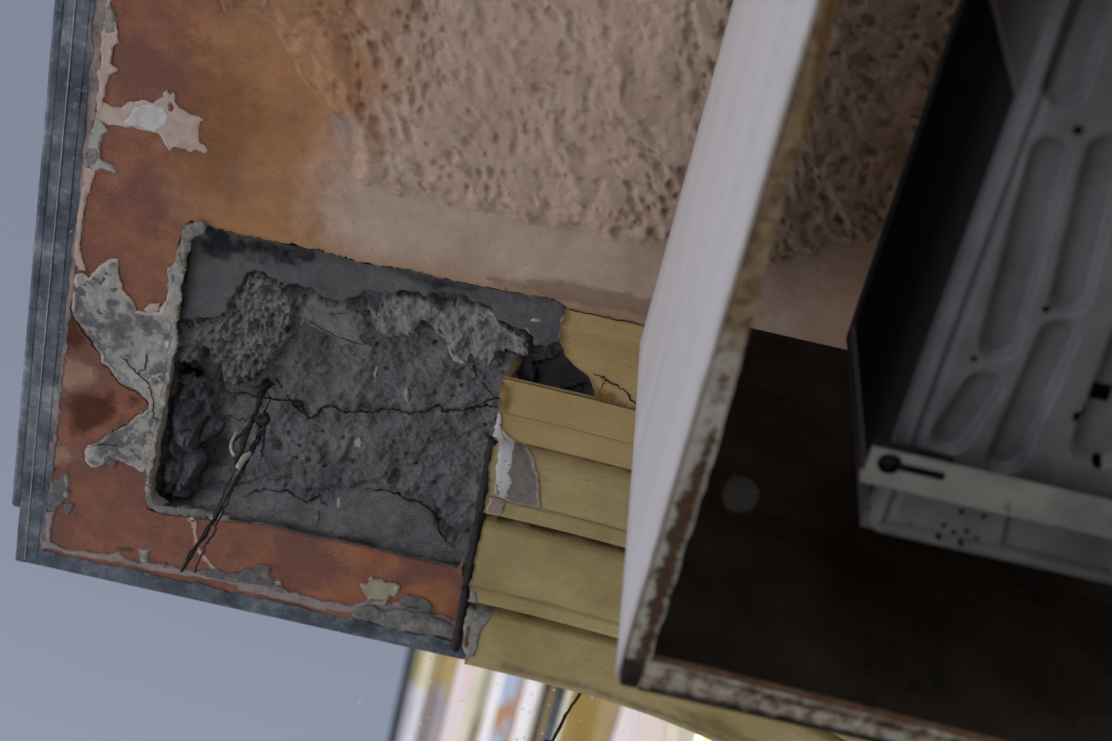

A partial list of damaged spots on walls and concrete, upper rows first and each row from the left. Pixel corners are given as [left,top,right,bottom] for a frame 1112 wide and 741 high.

spalling [40,0,595,658]
crack [224,365,500,419]
crack [242,488,329,526]
crack [366,488,457,547]
rust [633,426,928,741]